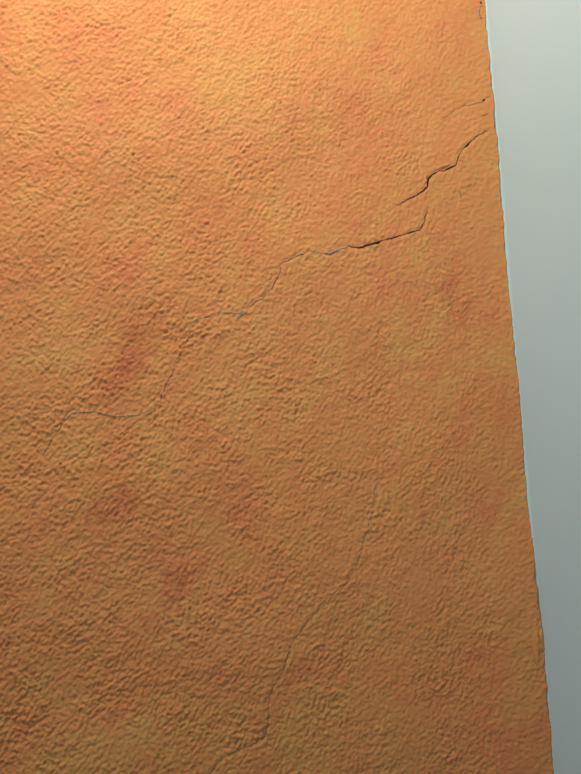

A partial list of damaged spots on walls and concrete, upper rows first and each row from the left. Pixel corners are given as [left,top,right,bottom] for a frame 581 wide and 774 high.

crack [43,96,489,455]
crack [207,482,377,774]